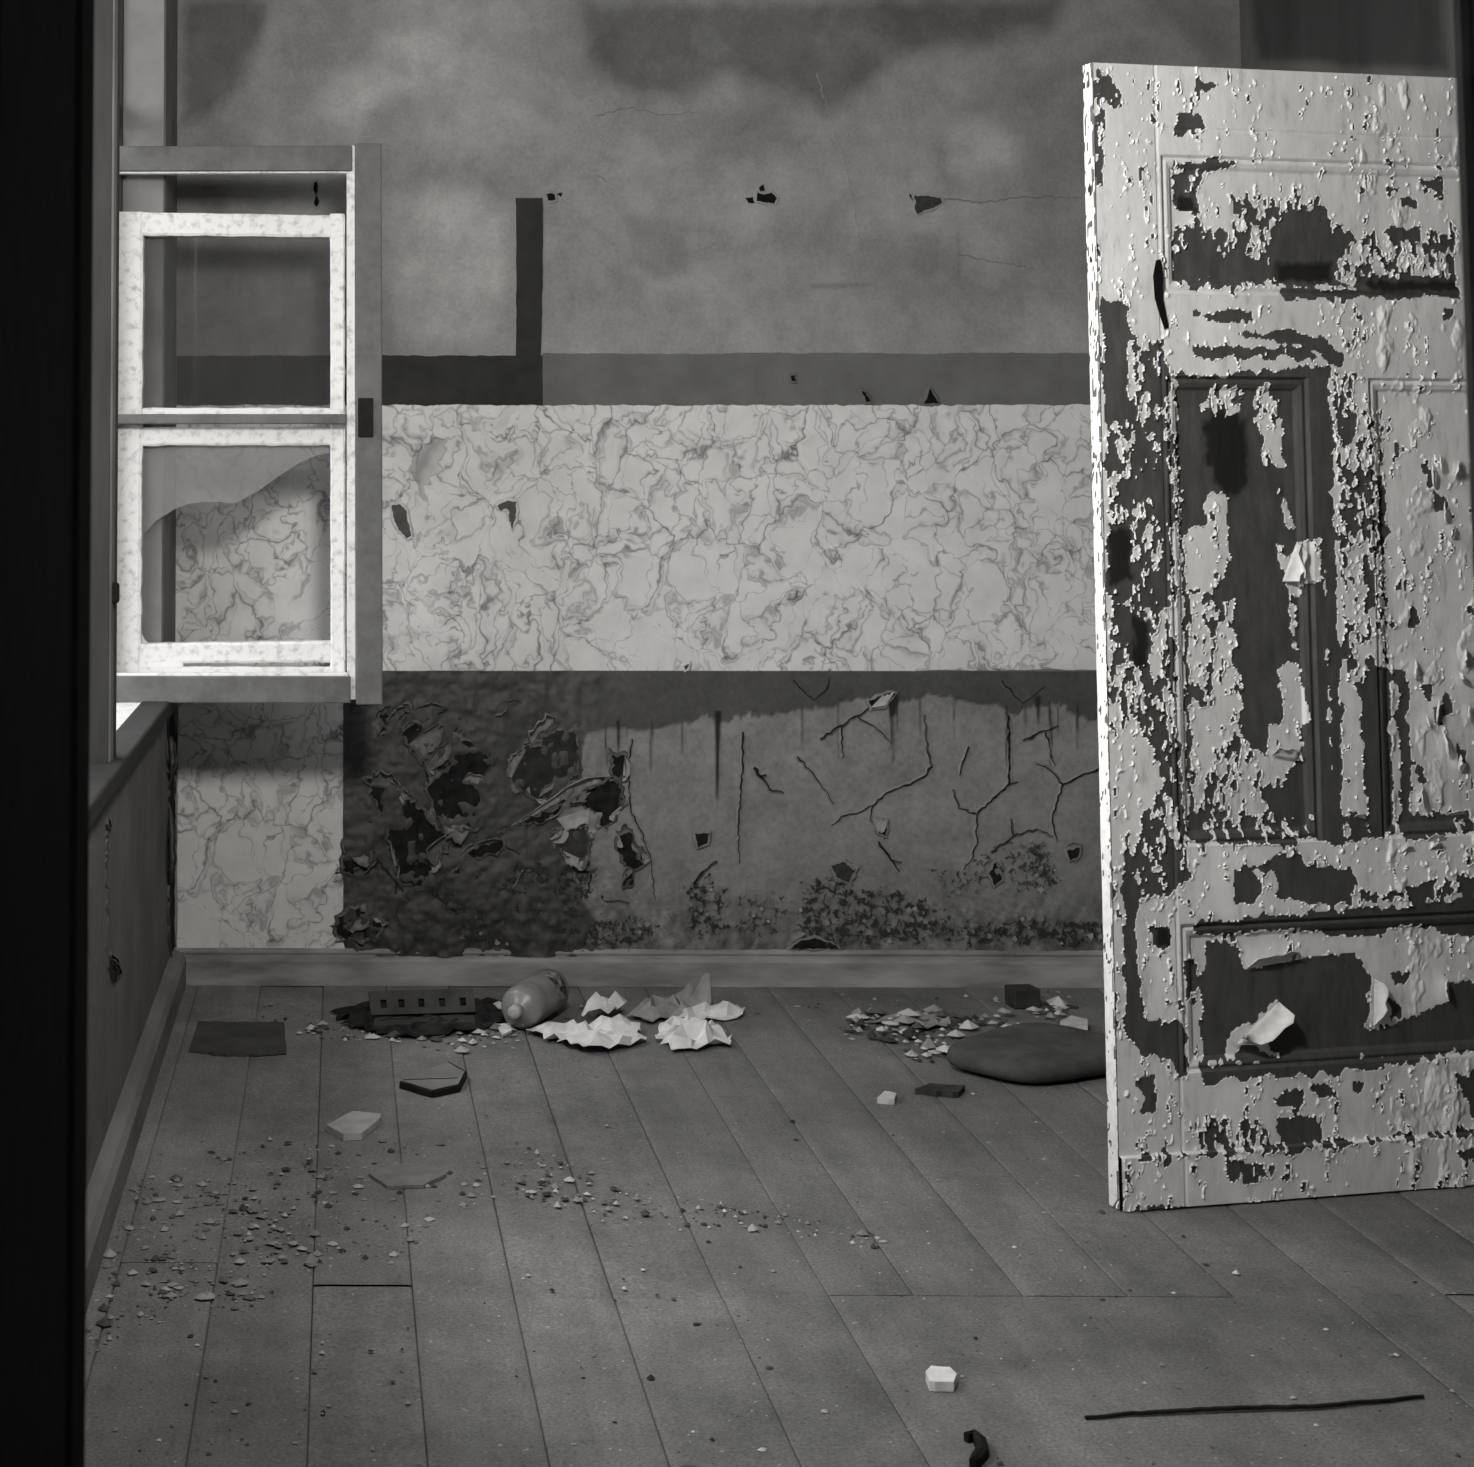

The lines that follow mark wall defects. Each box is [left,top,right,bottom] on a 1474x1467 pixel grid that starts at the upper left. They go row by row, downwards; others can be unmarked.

peeling [1431,456,1460,523]
peeling [1282,542,1313,582]
water stain [888,693,898,741]
peeling [1272,747,1304,762]
peeling [1426,697,1463,771]
crack [690,678,1099,891]
peeling [330,701,660,952]
crack [505,739,655,905]
peeling [1401,834,1447,853]
peeling [1236,1002,1295,1045]
peeling [1374,980,1389,1026]